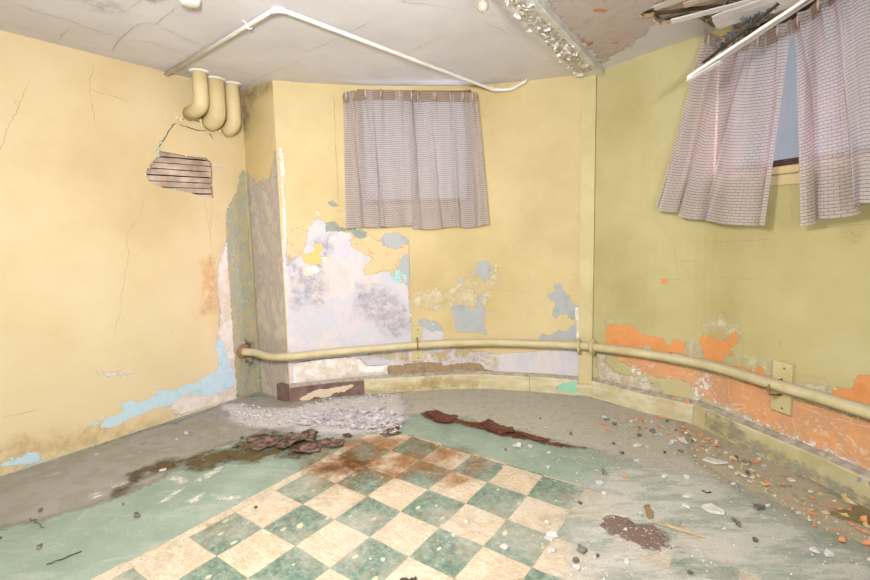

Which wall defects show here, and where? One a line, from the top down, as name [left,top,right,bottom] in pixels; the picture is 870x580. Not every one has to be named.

crack [3,0,198,120]
peeling [505,0,593,77]
flaking render [0,140,579,531]
peeling [596,318,870,470]